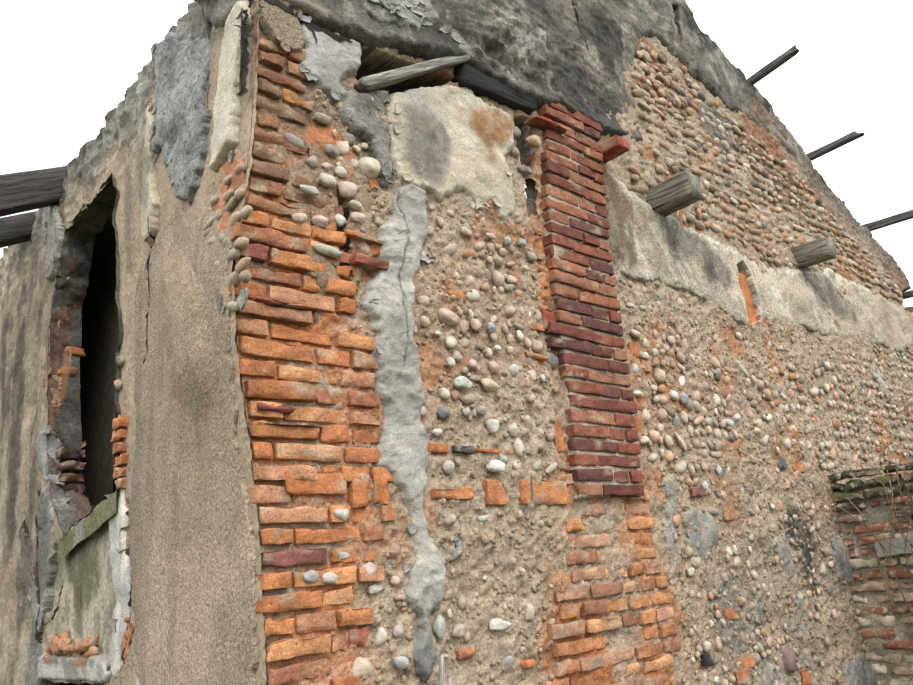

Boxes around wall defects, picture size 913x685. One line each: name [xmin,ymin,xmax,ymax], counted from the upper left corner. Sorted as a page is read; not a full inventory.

flaking render [44,205,71,281]
spalling [140,0,312,319]
peeling [299,64,319,82]
flaking render [258,81,515,300]
damp [1,322,24,550]
spalling [42,346,86,408]
flaking render [26,425,100,685]
flaking render [106,489,135,678]